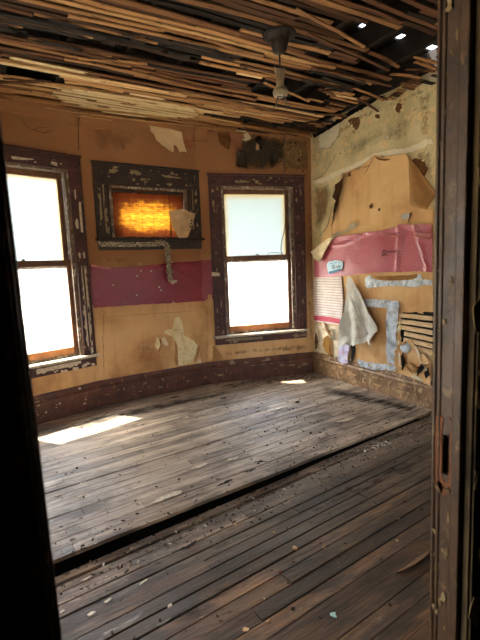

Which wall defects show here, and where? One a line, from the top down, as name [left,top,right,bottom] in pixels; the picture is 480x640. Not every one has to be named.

peeling [149,125,195,153]
peeling [313,92,441,185]
peeling [74,190,83,232]
peeling [97,184,110,234]
peeling [78,252,94,354]
flaking render [155,317,201,366]
peeling [36,361,95,374]